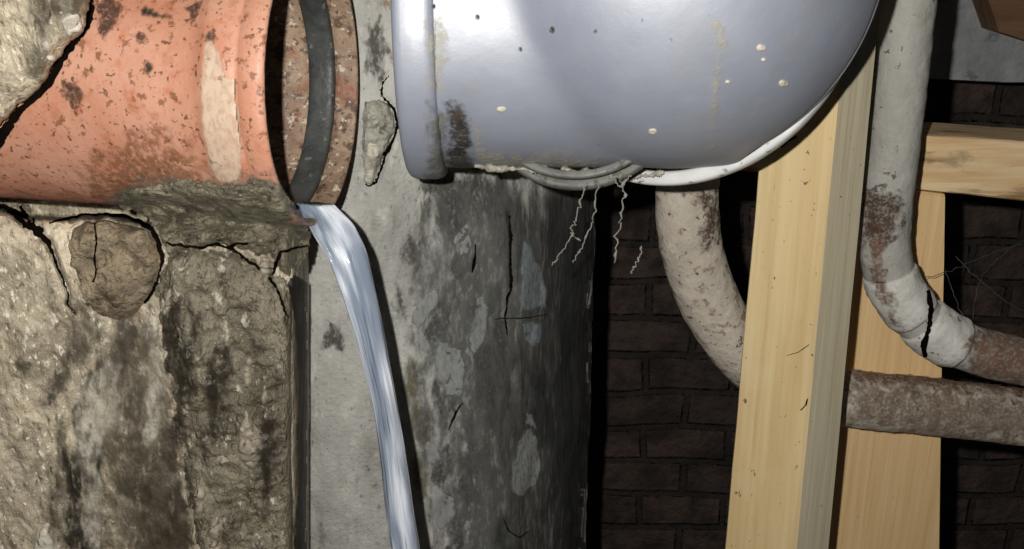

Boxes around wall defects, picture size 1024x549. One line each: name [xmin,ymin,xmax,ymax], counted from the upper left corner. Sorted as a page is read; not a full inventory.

crack [0,0,95,148]
crack [365,75,399,187]
crack [0,204,309,318]
crack [495,215,547,335]
damp [47,303,231,549]
damp [257,417,277,500]
damp [287,275,308,549]
crack [449,402,463,429]
damp [402,168,593,549]